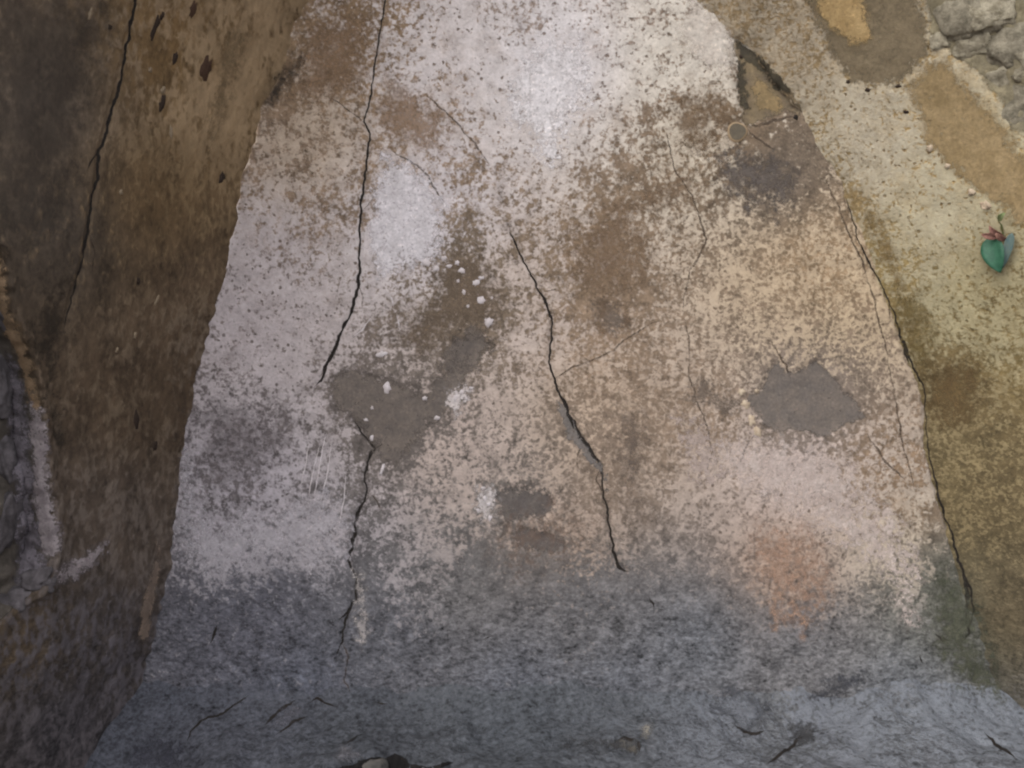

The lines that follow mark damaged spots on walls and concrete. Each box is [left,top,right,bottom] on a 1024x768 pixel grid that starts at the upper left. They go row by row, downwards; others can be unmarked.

crack [63,0,137,329]
crack [317,0,445,384]
water stain [367,151,446,280]
water stain [381,74,455,155]
flaking render [733,40,801,127]
water stain [445,384,470,419]
crack [510,233,658,572]
crack [826,180,975,641]
crack [264,421,386,734]